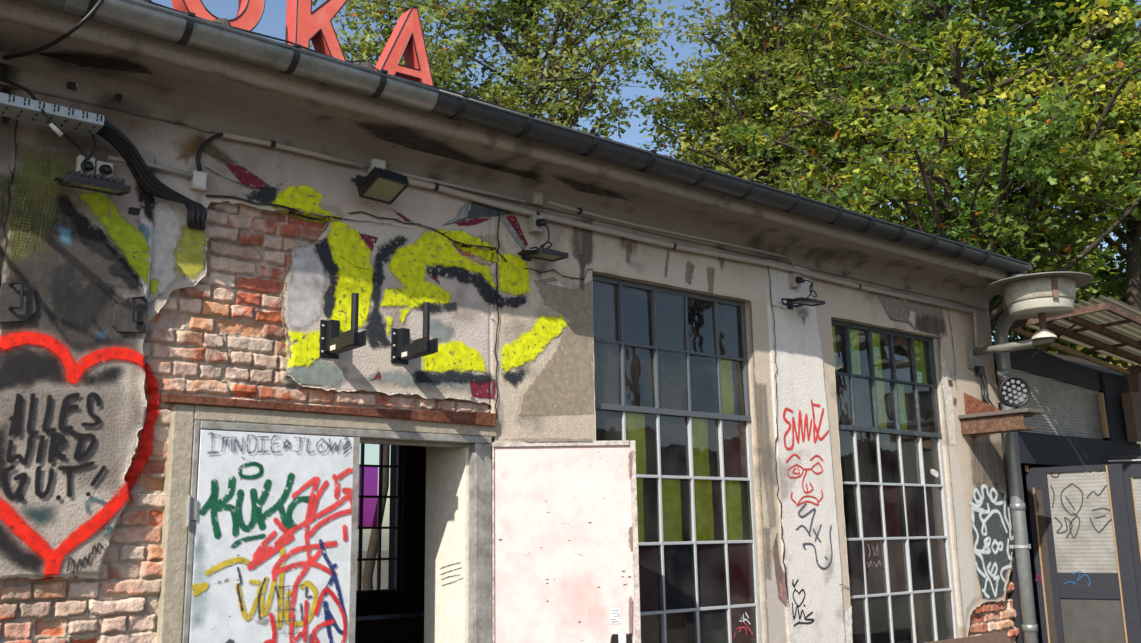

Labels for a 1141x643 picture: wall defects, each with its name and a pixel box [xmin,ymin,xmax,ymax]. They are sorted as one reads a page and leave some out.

water stain [358,124,538,180]
water stain [557,177,625,199]
flaking render [0,200,493,643]
flaking render [968,557,1019,643]